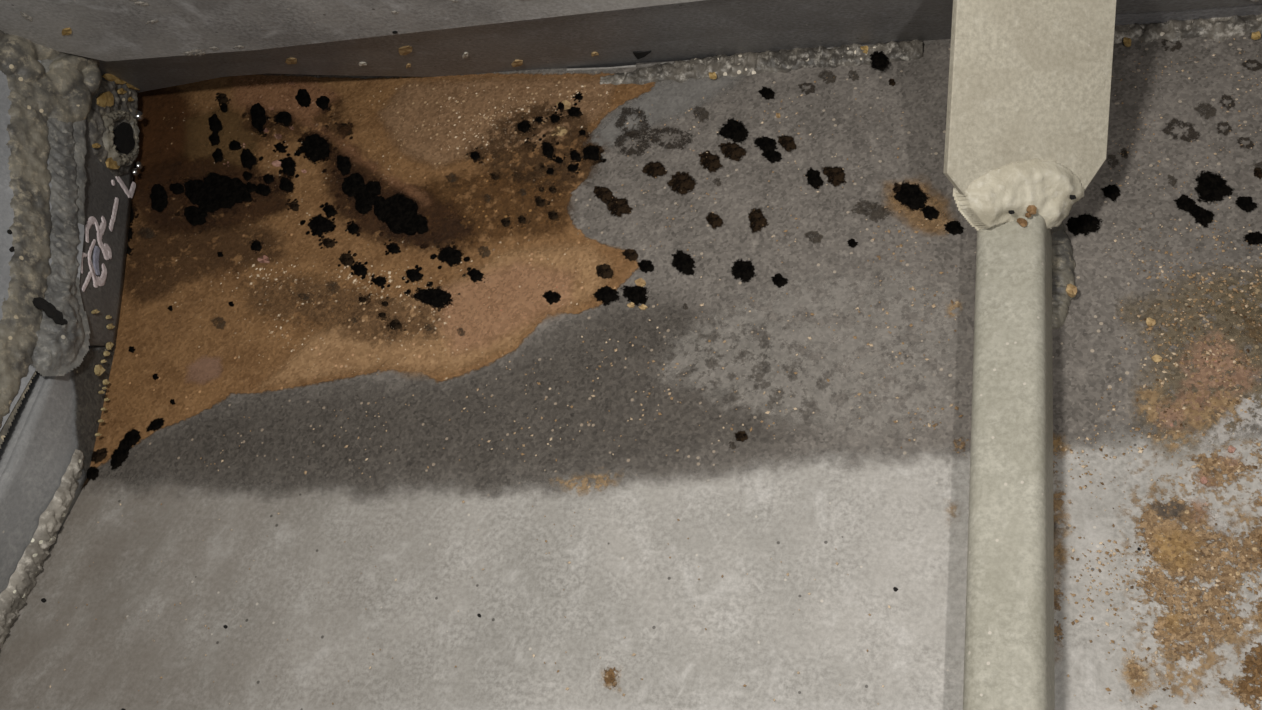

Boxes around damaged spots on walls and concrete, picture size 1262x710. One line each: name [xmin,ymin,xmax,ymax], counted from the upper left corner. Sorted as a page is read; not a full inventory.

damp [1115,5,1262,26]
damp [81,39,977,494]
damp [1052,34,1262,447]
rust [604,667,619,689]
rust [1124,281,1262,710]